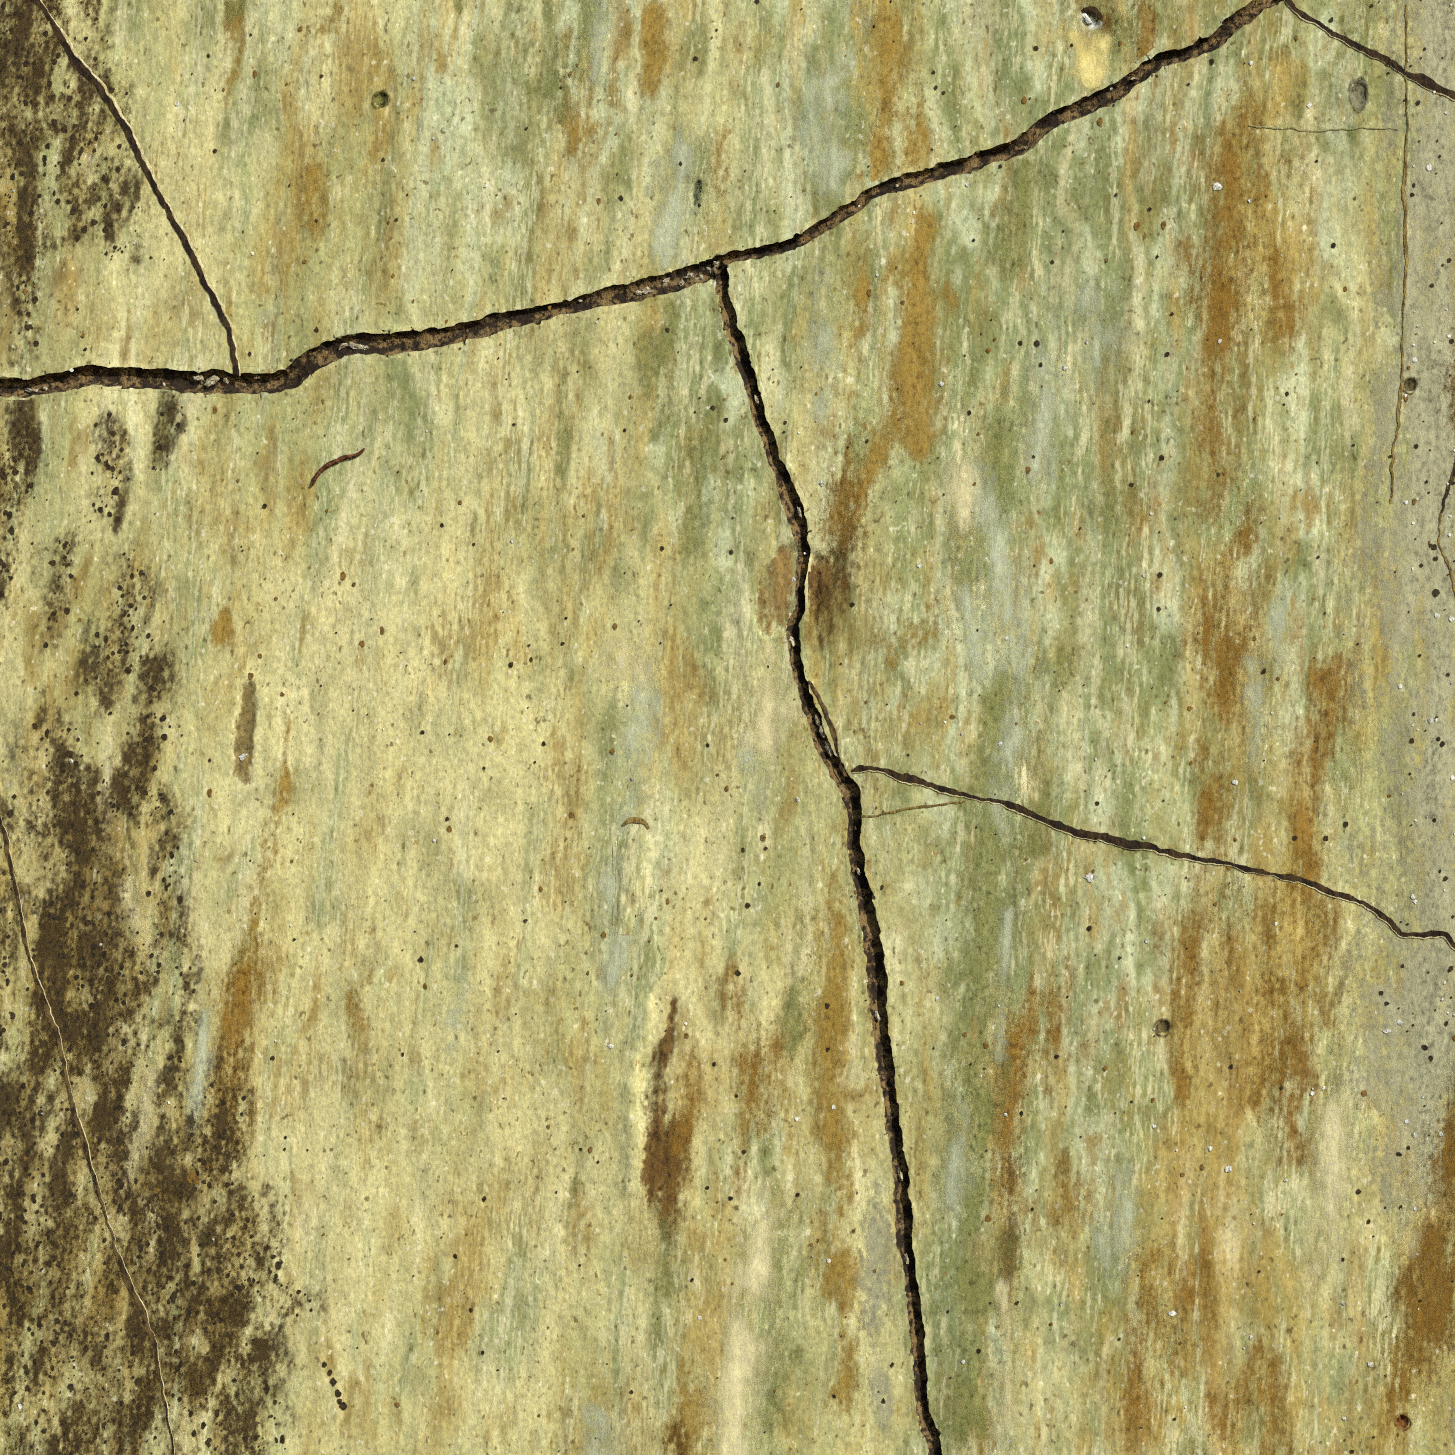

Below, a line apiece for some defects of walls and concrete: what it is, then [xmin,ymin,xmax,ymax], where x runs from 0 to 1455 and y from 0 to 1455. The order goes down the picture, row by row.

mould [0,398,42,607]
mould [0,0,153,371]
mould [90,412,131,533]
mould [151,391,186,470]
crack [0,0,1455,687]
rust [1184,89,1301,520]
crack [0,815,175,1455]
mould [0,535,324,1455]
crack [713,262,1455,1455]
rust [1154,737,1237,1106]
rust [1230,653,1347,1176]
rust [1385,1102,1455,1437]